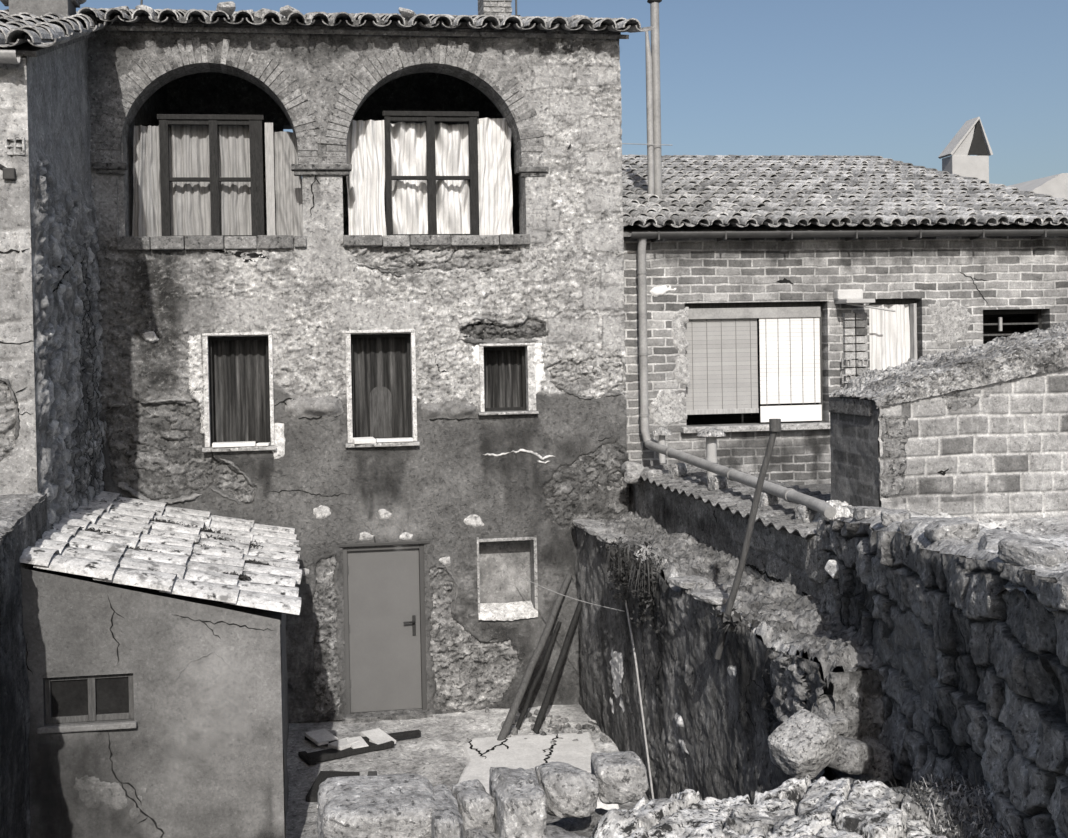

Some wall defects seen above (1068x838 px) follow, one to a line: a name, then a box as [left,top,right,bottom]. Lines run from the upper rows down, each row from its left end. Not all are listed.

flaking render [459,316,548,345]
flaking render [0,378,21,460]
flaking render [102,398,257,506]
flaking render [483,442,629,528]
crack [108,597,124,664]
crack [177,615,273,638]
flaking render [299,555,342,716]
flaking render [429,557,521,712]
crack [107,731,164,838]
spalling [305,728,396,750]
crack [468,735,511,759]
crack [543,733,558,763]